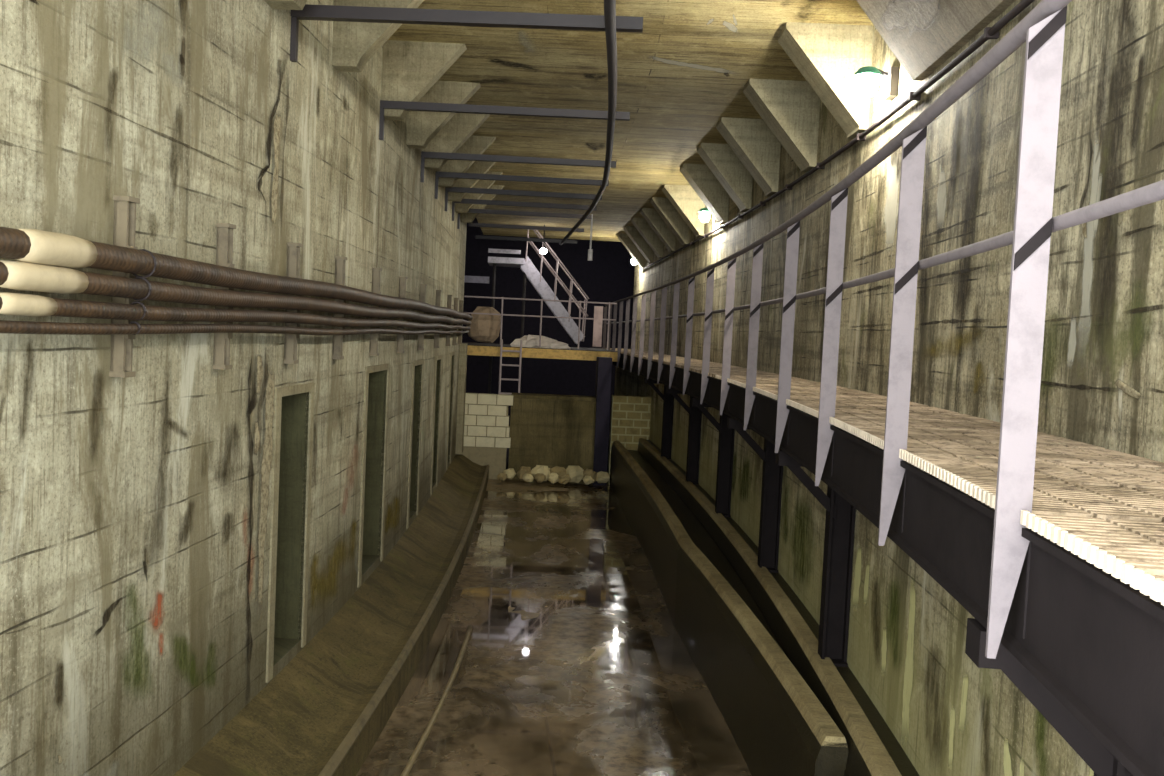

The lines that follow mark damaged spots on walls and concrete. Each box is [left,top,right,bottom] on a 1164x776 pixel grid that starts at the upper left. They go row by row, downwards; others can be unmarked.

crack [179,0,187,13]
crack [95,104,229,165]
crack [180,41,240,119]
crack [258,60,289,223]
water stain [1089,0,1144,205]
water stain [1068,214,1116,360]
water stain [852,549,887,671]
water stain [902,585,916,737]
water stain [927,653,969,765]
water stain [1003,742,1024,776]
water stain [1036,711,1045,776]